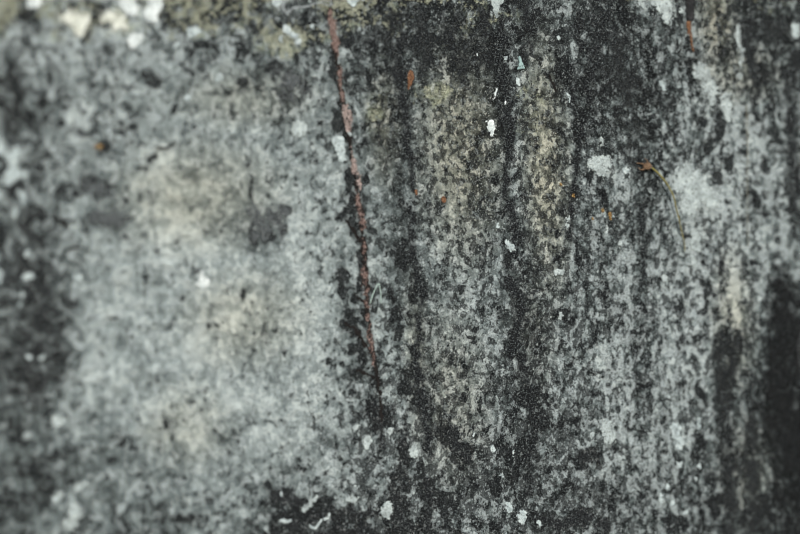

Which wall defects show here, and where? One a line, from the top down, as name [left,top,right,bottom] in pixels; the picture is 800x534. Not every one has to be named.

crack [327,7,383,423]
water stain [382,0,546,496]
water stain [566,0,644,246]
water stain [536,508,612,534]
water stain [715,273,800,534]